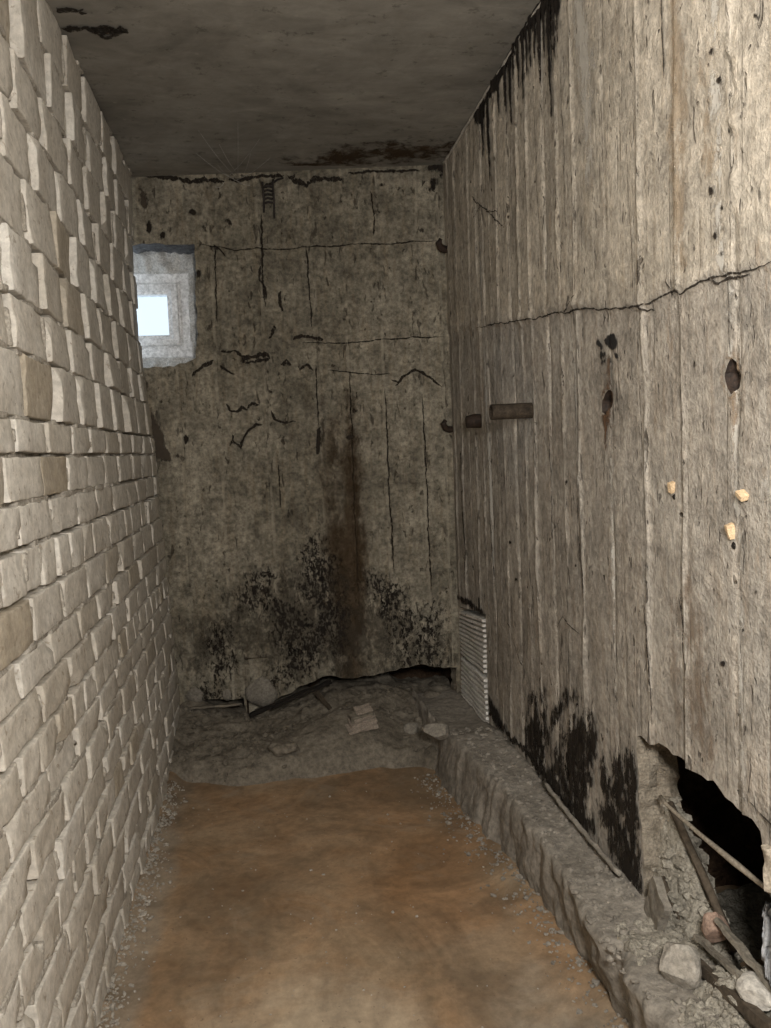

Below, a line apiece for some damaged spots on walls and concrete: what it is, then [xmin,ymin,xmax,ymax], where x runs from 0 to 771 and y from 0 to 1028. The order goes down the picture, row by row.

damp [473,0,561,181]
damp [574,0,592,183]
crack [658,0,666,78]
crack [146,120,771,601]
spalling [602,390,613,414]
spalling [725,358,741,394]
damp [196,621,243,700]
damp [237,533,351,694]
damp [361,572,449,668]
spalling [525,685,771,1028]